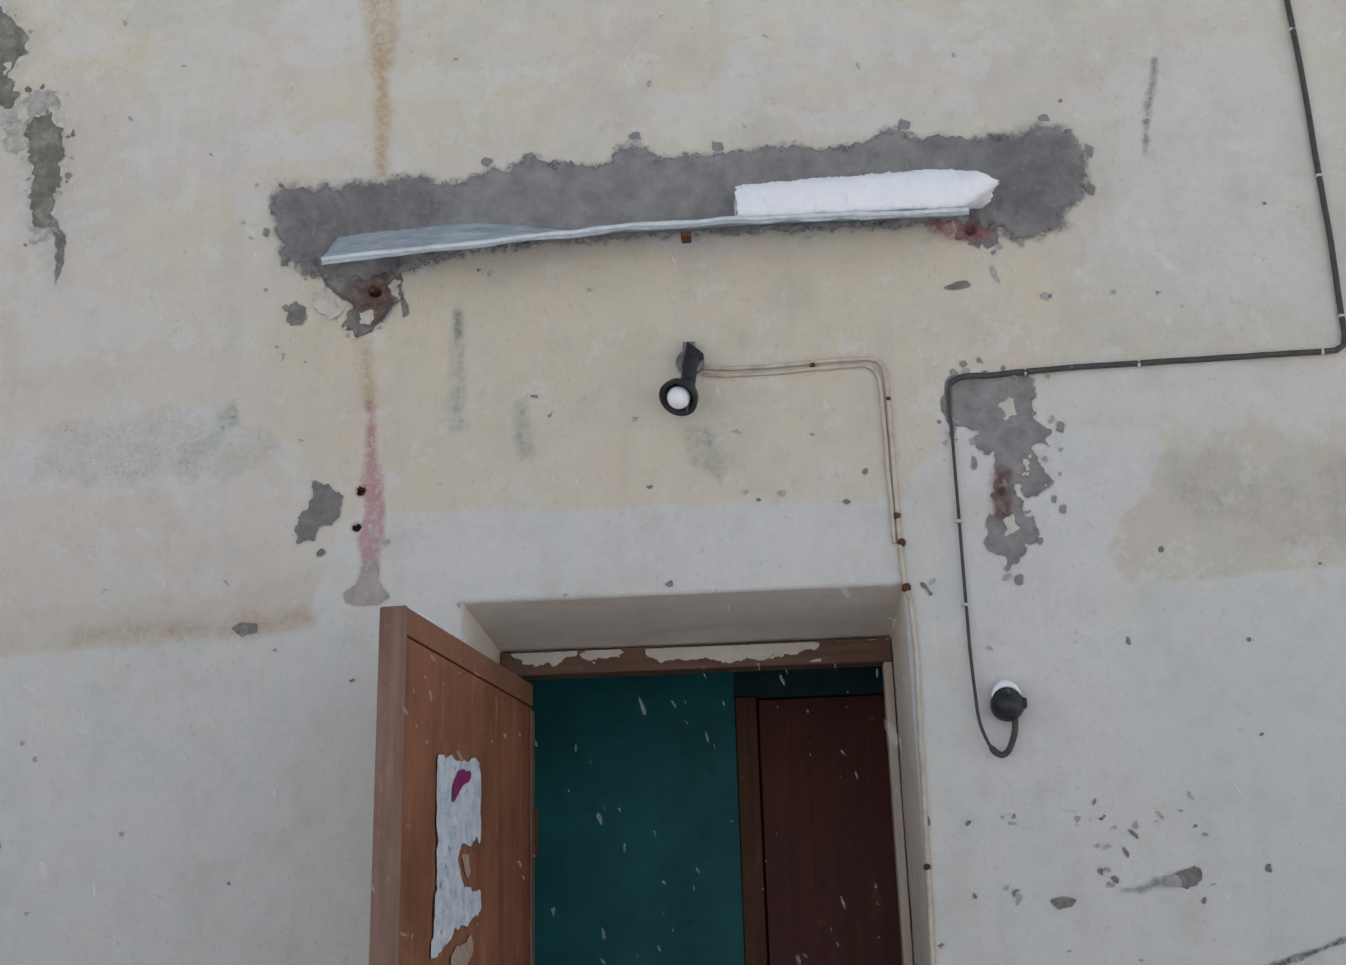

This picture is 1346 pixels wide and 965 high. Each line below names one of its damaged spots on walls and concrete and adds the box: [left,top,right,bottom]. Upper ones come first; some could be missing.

flaking render [0,0,75,282]
flaking render [936,216,1003,283]
flaking render [944,280,971,290]
flaking render [936,357,1067,585]
flaking render [1092,798,1139,857]
flaking render [1003,885,1023,906]
flaking render [1098,867,1119,888]
flaking render [1136,865,1216,904]